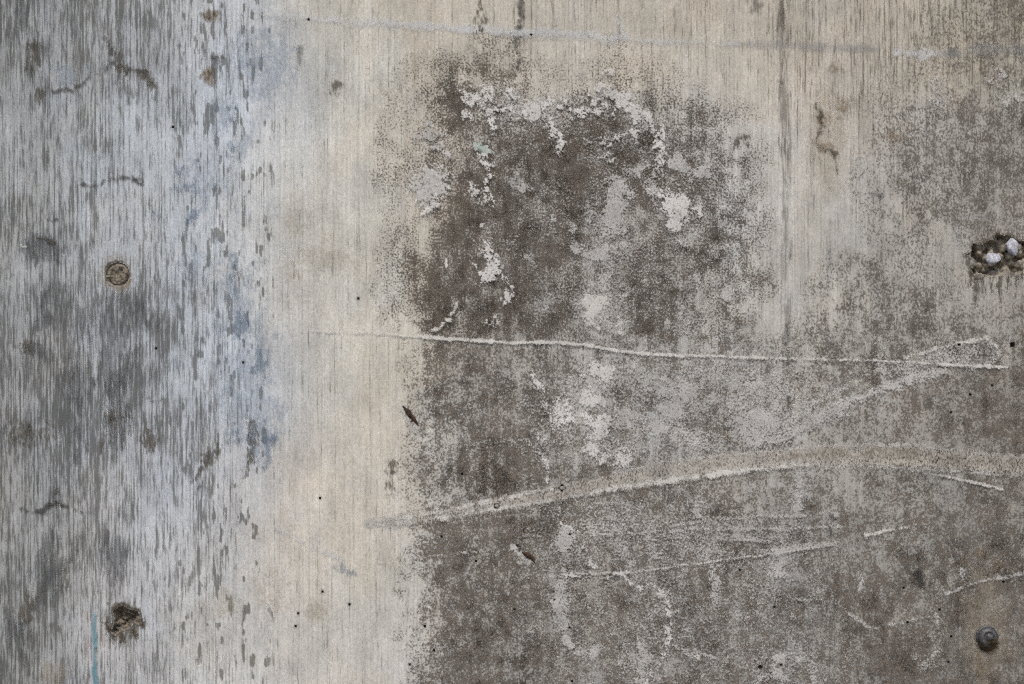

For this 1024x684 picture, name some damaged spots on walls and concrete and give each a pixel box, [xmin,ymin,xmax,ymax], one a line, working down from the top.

damp [354,0,1024,684]
flaking render [968,238,1019,280]